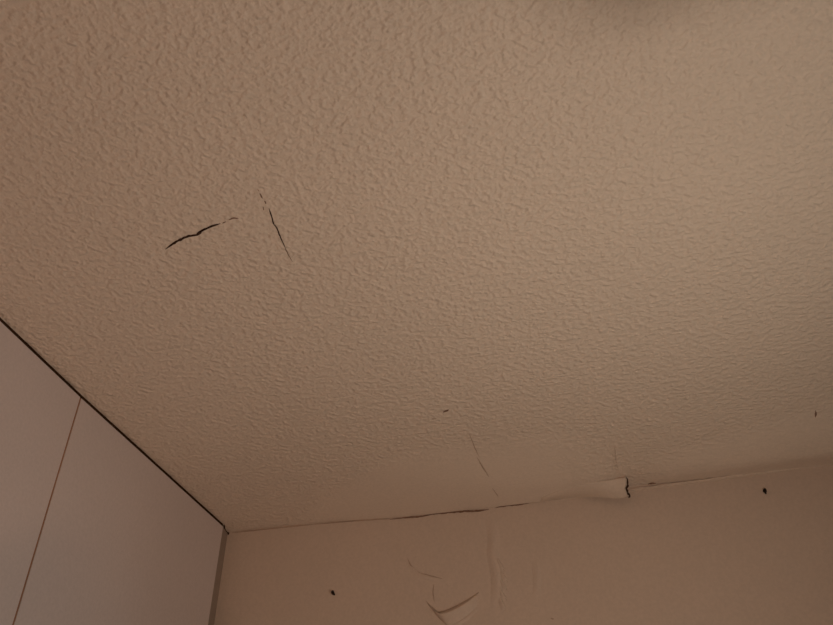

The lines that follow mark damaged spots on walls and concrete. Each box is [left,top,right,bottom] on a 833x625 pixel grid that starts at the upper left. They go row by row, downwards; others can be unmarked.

crack [166,217,239,249]
crack [257,188,293,262]
crack [233,434,528,533]